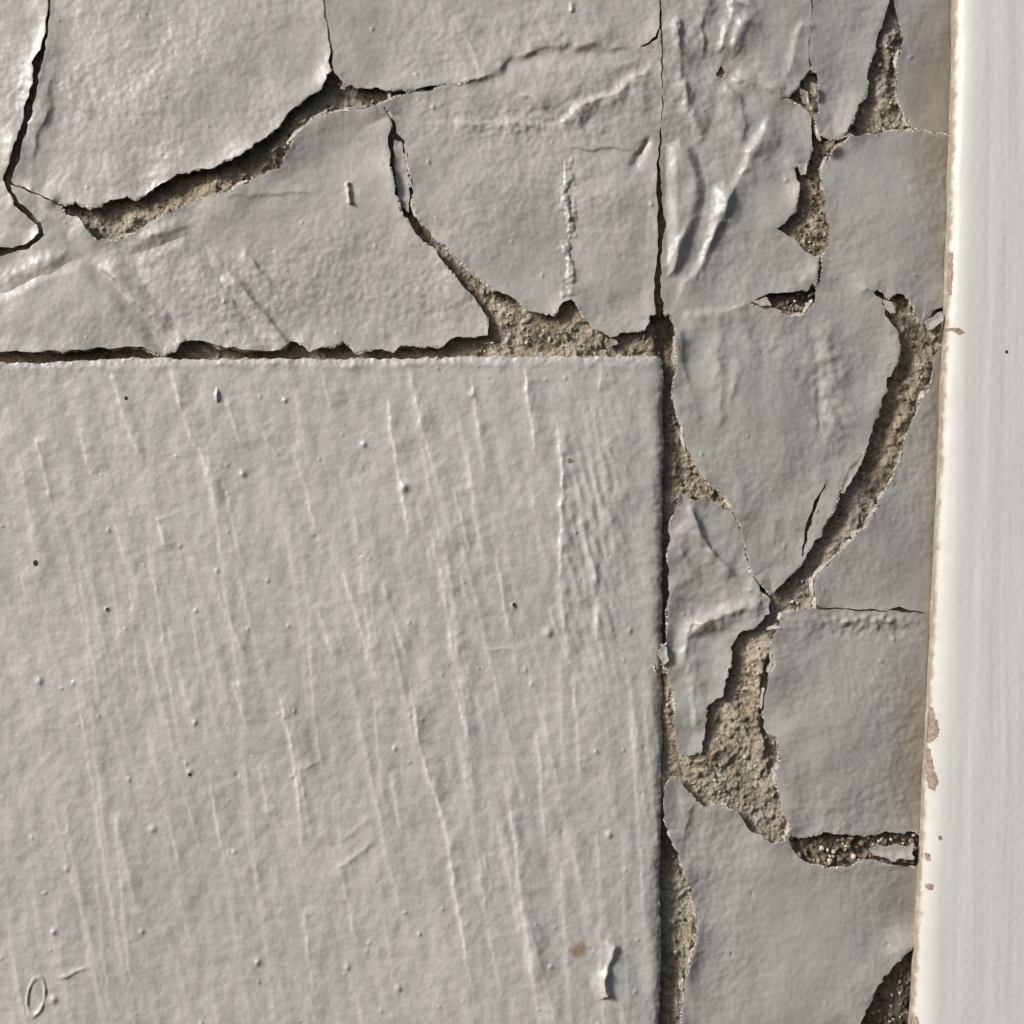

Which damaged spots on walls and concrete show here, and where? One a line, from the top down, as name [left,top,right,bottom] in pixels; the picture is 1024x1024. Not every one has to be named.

crack [0,0,62,256]
peeling [58,68,491,242]
crack [640,0,666,321]
peeling [777,0,949,317]
spalling [472,276,965,1024]